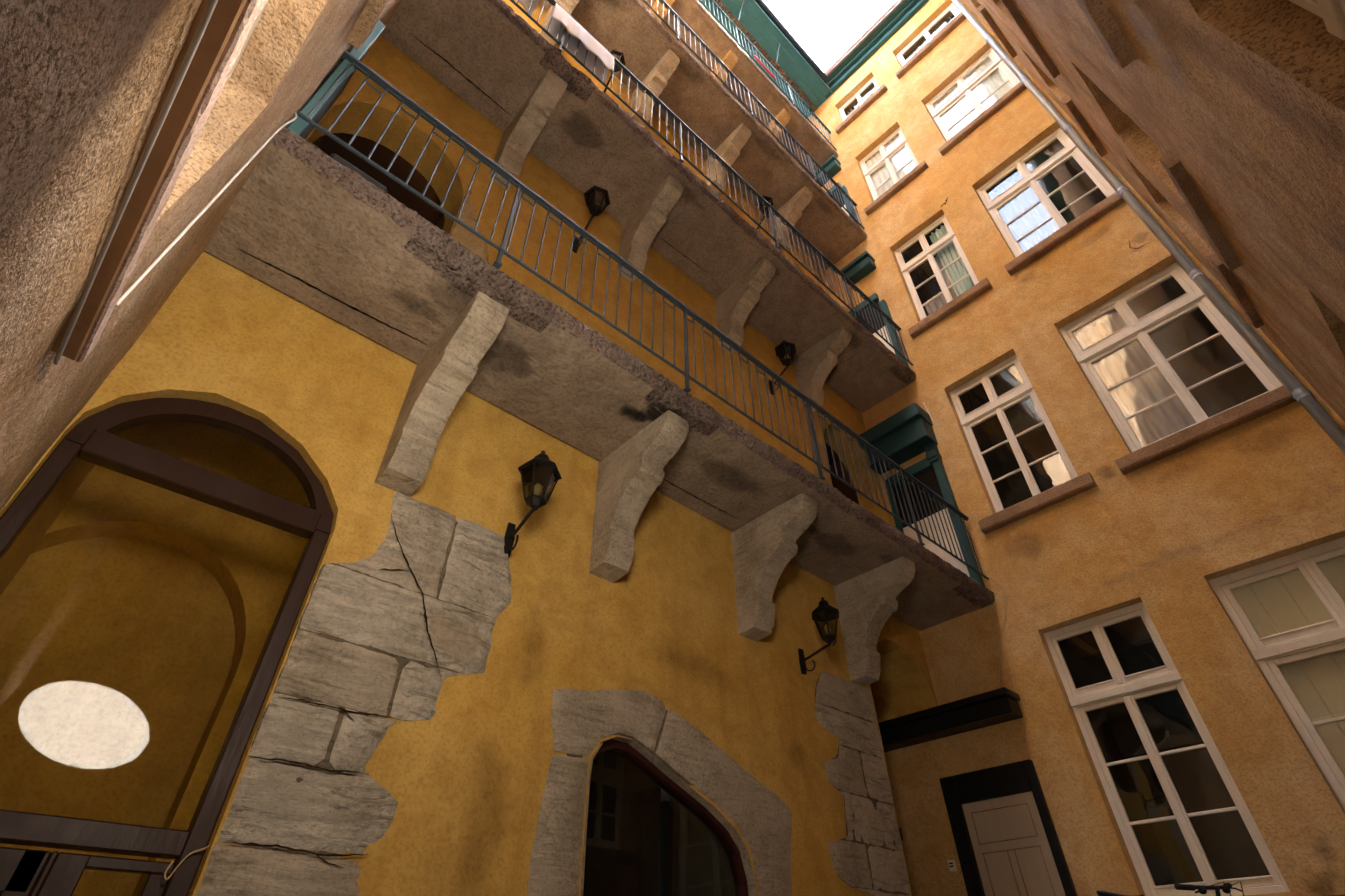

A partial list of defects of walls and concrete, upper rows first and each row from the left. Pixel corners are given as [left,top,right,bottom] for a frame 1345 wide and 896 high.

flaking render [196,492,512,896]
crack [379,513,441,676]
flaking render [815,671,911,896]